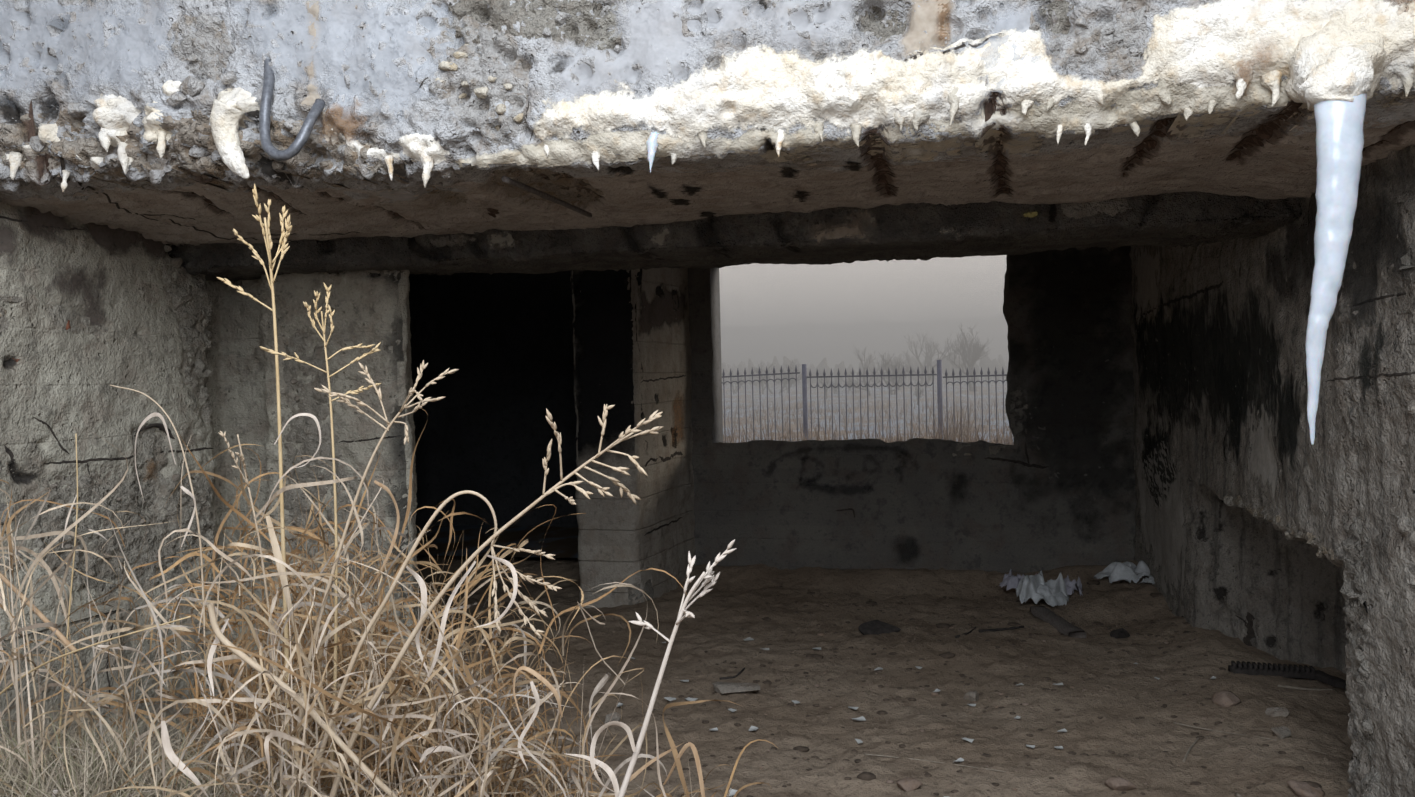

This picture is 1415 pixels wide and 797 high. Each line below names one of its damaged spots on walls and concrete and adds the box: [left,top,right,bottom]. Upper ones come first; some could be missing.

leakage [455,0,1415,197]
leakage [27,119,70,185]
leakage [176,167,304,214]
leakage [639,284,686,335]
leakage [1340,163,1407,400]
leakage [1132,199,1317,608]
crack [34,417,213,475]
crack [338,435,394,443]